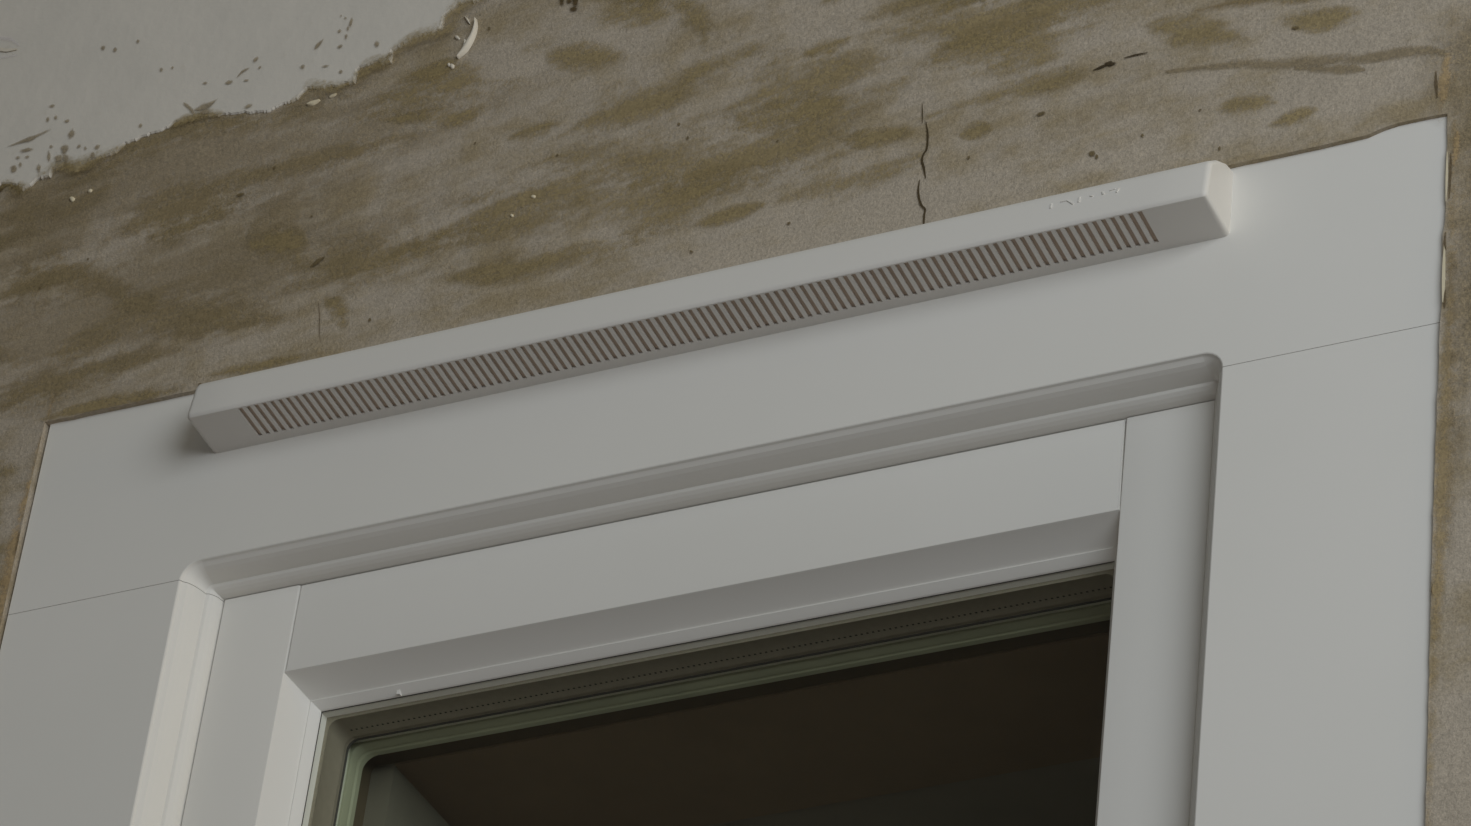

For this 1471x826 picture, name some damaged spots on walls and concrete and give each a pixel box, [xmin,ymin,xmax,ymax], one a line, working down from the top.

peeling [447,16,478,69]
water stain [880,0,1106,101]
water stain [1156,0,1352,45]
water stain [0,115,259,248]
water stain [124,58,479,239]
water stain [286,38,920,289]
crack [917,104,929,224]
water stain [4,251,277,419]
water stain [217,356,302,374]